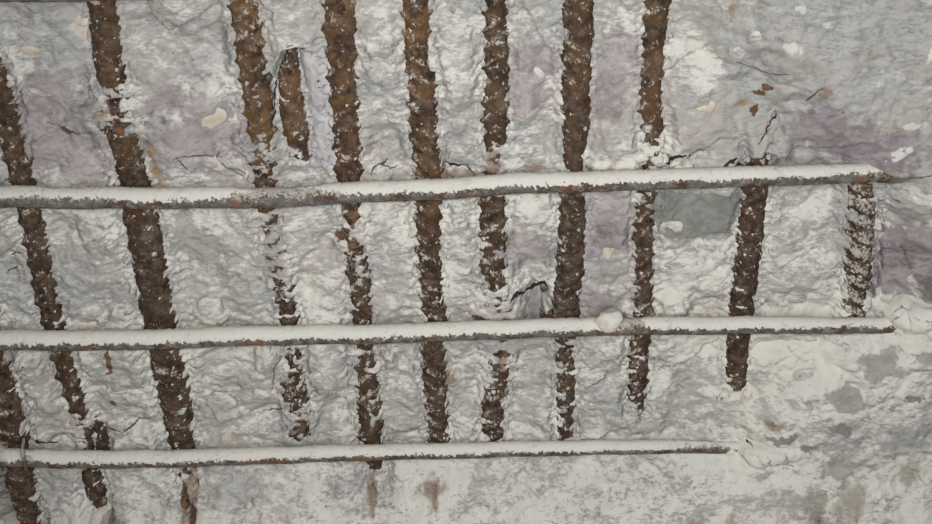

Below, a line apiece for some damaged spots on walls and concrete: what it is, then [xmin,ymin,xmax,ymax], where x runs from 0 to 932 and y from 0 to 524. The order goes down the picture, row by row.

rust [99,99,126,136]
rust [738,84,777,116]
spalling [0,0,932,331]
rust [335,209,360,253]
rust [104,350,113,375]
spalling [0,329,917,451]
rust [180,468,198,524]
spalling [1,453,742,524]